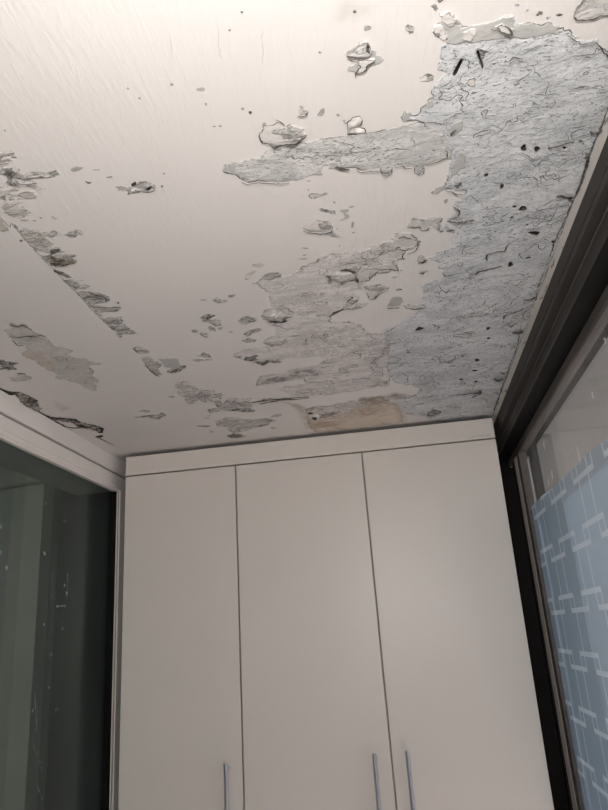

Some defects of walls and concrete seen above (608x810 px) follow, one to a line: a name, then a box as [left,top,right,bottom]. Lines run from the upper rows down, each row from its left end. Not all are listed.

peeling [0,151,138,338]
peeling [133,0,608,438]
peeling [0,323,101,412]
spalling [51,417,102,433]
damp [304,403,402,432]